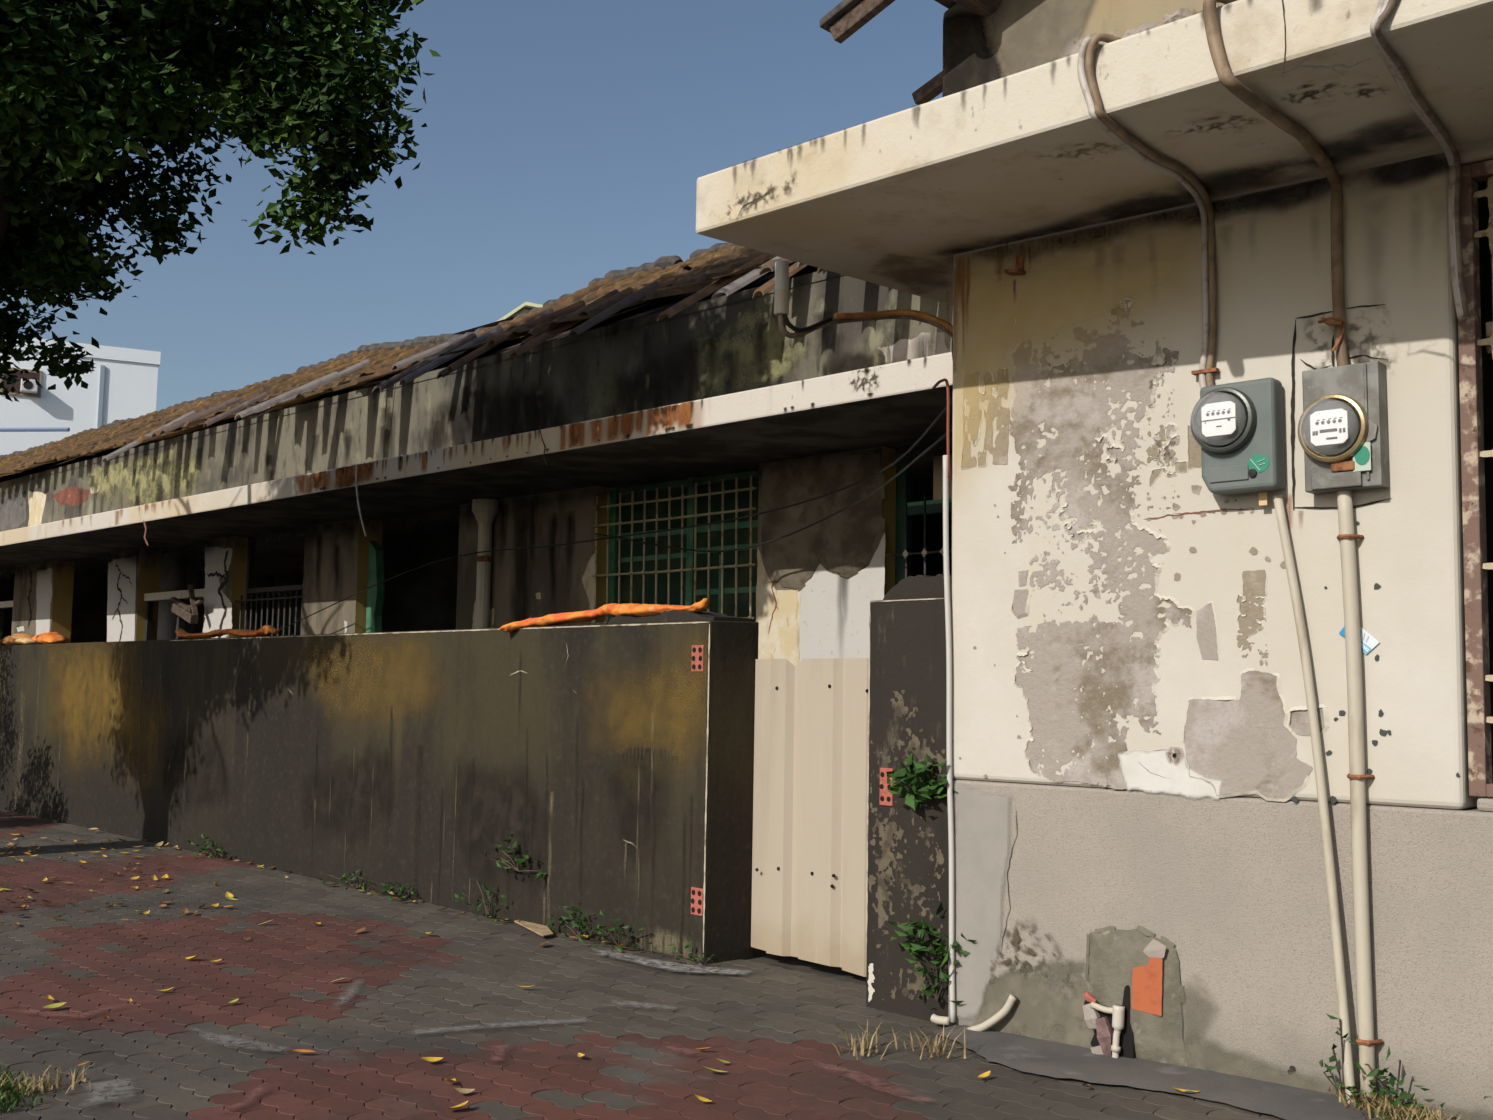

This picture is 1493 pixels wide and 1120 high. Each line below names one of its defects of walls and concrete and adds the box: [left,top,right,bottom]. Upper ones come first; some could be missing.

peeling [1057,8,1197,60]
leakage [728,178,794,214]
leakage [820,314,890,396]
corrosion [297,441,483,493]
leakage [307,387,563,490]
corrosion [561,402,691,450]
leakage [0,490,27,532]
peeling [961,297,1346,803]
crack [112,562,132,641]
crack [207,550,229,638]
peeling [1372,709,1392,746]
spalling [1083,925,1189,1066]